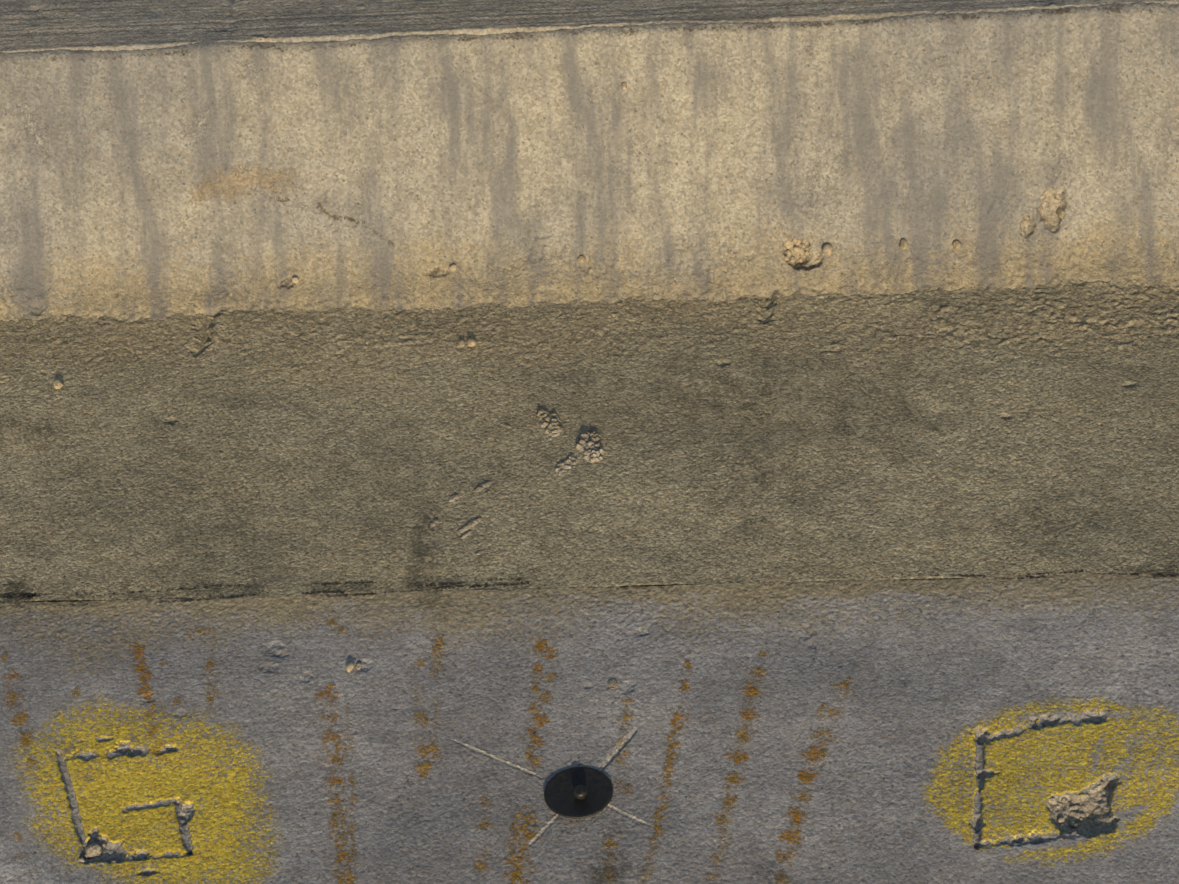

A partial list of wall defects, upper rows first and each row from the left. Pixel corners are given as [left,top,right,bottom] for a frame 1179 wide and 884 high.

spalling [78,828,155,876]
peeling [115,742,141,757]
rust [129,642,166,760]
rust [315,684,356,884]
rust [526,638,557,767]
rust [642,709,689,879]
rust [708,651,769,880]
rust [774,704,838,884]
peeling [1015,832,1043,844]
peeling [1031,715,1059,729]
spalling [1046,774,1120,838]
peeling [1083,713,1104,724]